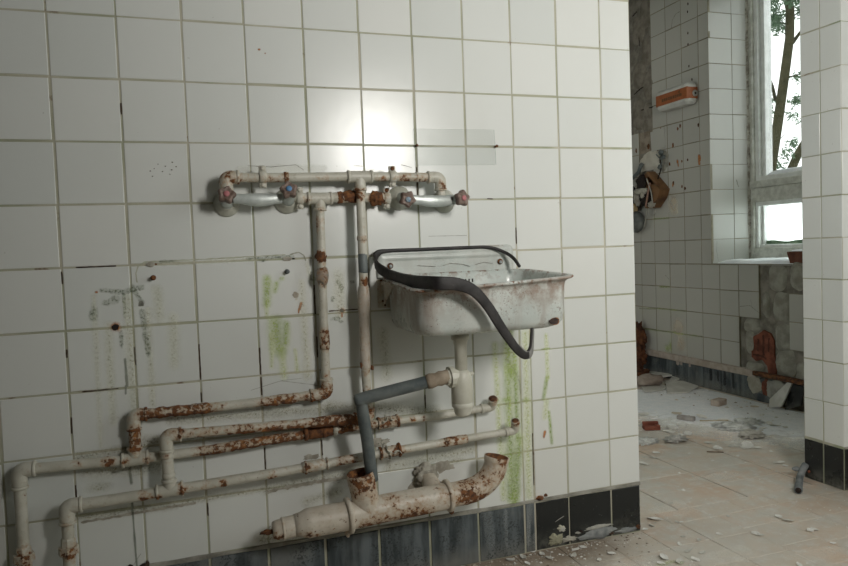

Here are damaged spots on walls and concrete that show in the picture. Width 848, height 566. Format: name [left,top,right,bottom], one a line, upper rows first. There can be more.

spalling [628,0,653,160]
spalling [741,262,804,403]